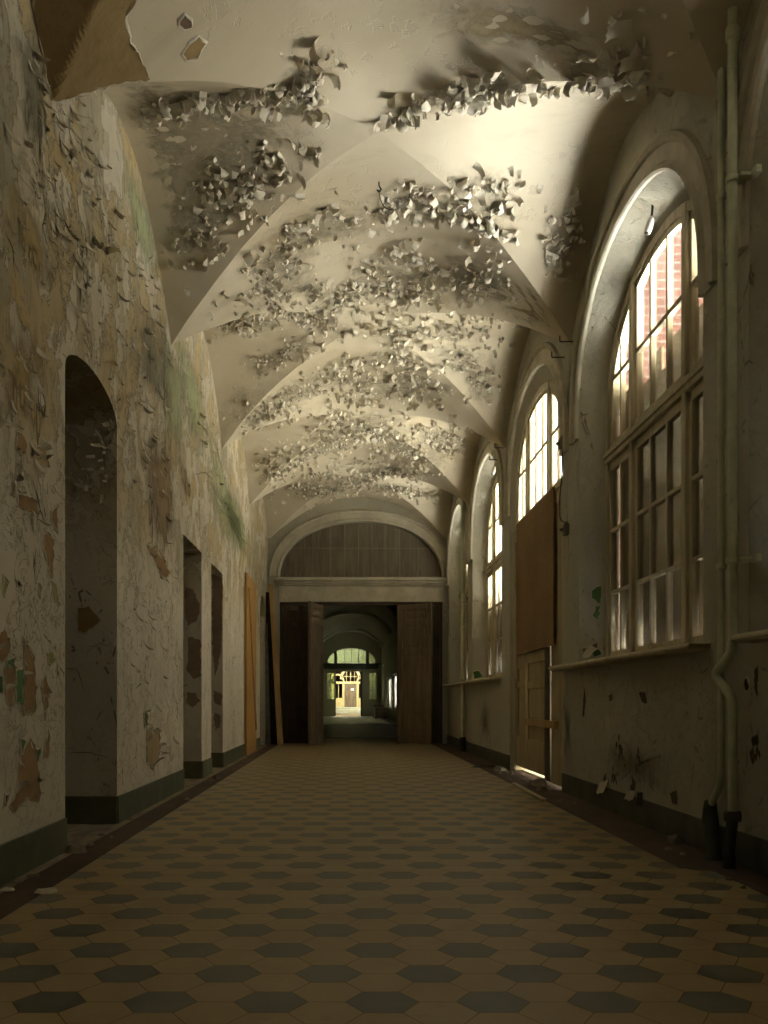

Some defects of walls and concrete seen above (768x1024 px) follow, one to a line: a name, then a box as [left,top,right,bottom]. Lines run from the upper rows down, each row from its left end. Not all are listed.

peeling [373,0,675,134]
spalling [1,0,348,515]
peeling [207,162,586,515]
damp [148,414,190,548]
peeling [118,535,223,684]
peeling [0,627,55,814]
peeling [143,704,179,770]
peeling [186,692,201,707]